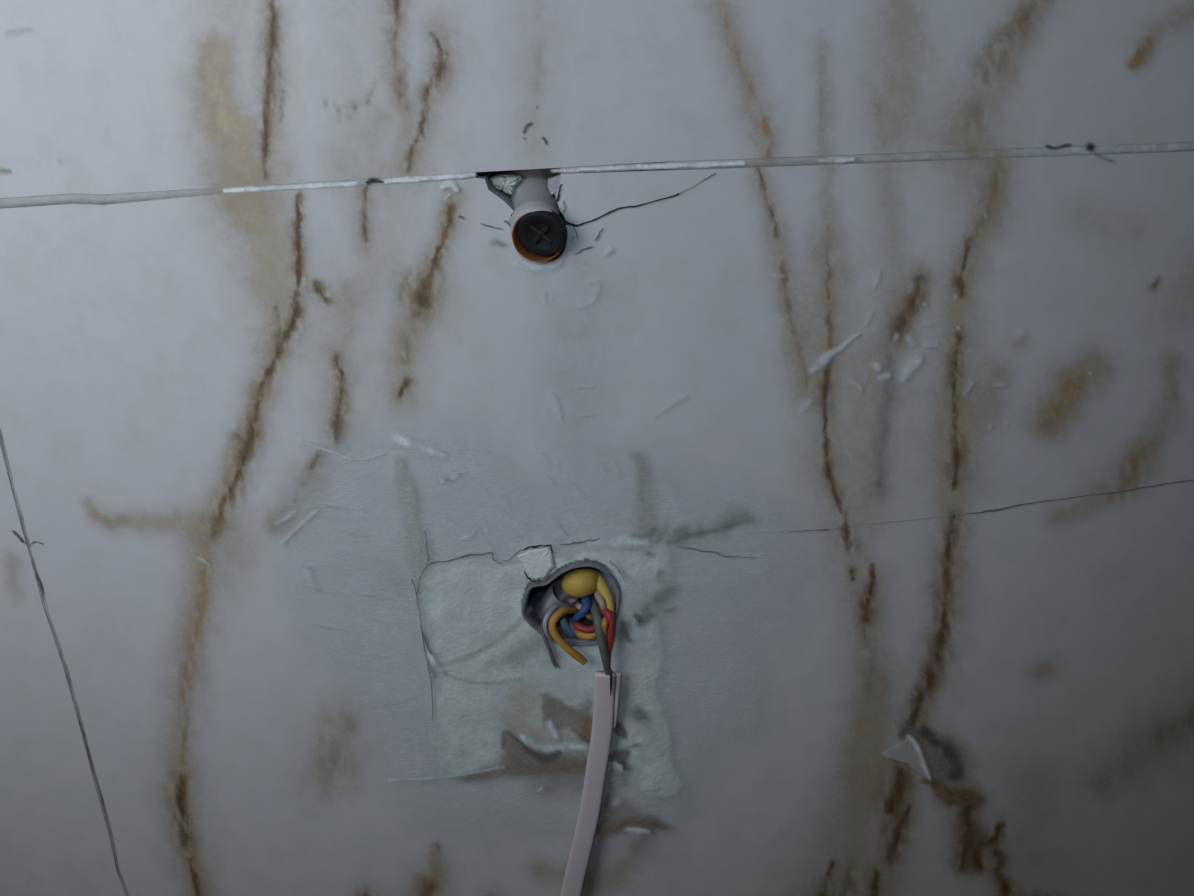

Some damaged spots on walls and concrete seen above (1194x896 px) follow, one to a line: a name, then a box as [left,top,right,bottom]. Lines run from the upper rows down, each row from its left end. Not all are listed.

crack [565,173,716,254]
corrosion [164,7,303,896]
corrosion [392,193,459,403]
crack [412,533,521,720]
spalling [517,545,555,582]
corrosion [768,225,868,510]
crack [676,480,1192,558]
corrosion [907,160,1006,732]
spalling [389,695,590,791]
spalling [610,722,637,784]
spalling [881,726,981,803]
corrosion [945,736,1041,896]